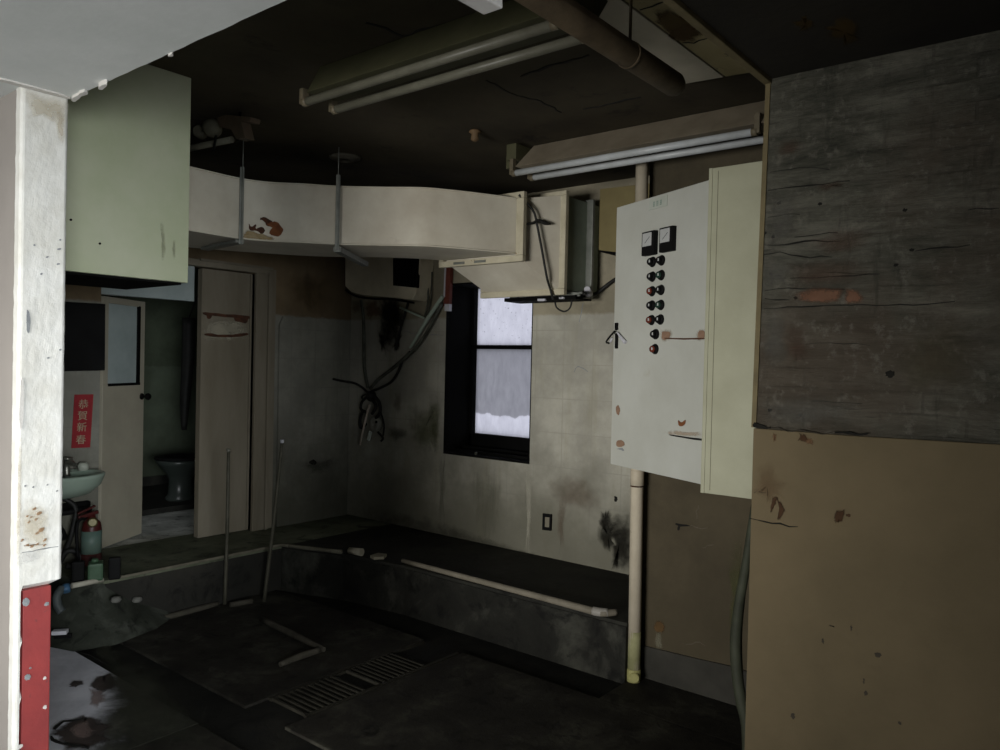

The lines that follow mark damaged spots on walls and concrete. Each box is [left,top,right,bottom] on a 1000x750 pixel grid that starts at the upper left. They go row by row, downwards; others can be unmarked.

spalling [793,289,861,303]
corrosion [21,507,47,548]
water stain [601,513,630,565]
crack [750,518,798,527]